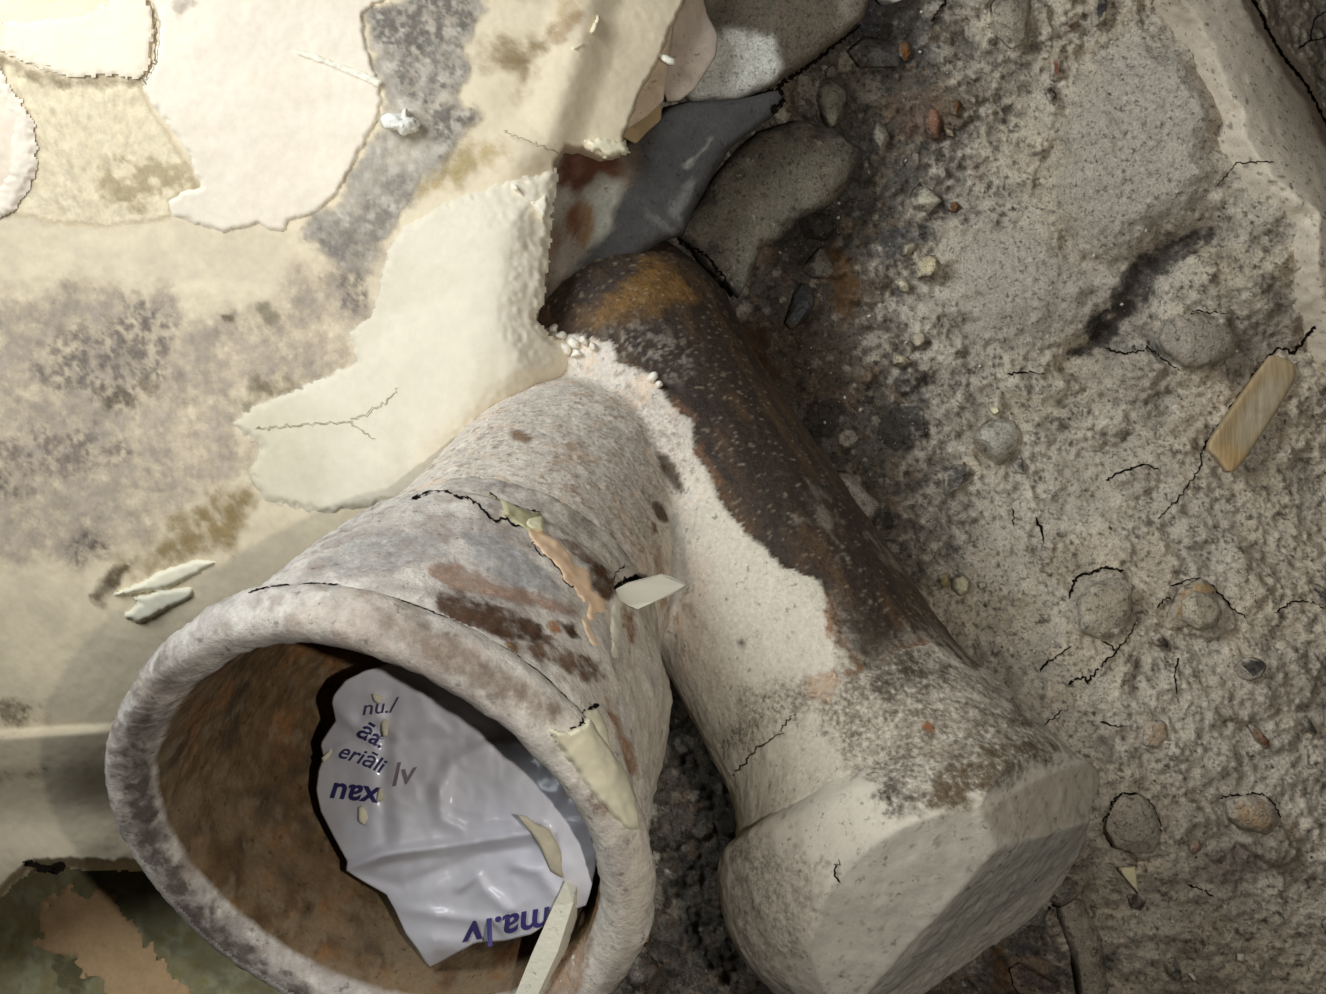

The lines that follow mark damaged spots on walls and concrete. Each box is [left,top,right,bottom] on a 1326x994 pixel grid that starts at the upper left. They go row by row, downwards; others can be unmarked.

peeling [0,0,384,234]
crack [1251,0,1326,124]
water stain [0,0,492,562]
crack [1106,326,1316,519]
water stain [90,565,128,600]
crack [411,490,574,588]
crack [613,564,645,589]
crack [1069,566,1124,599]
crack [1040,577,1324,726]
crack [1102,792,1162,832]
peeling [31,883,190,994]